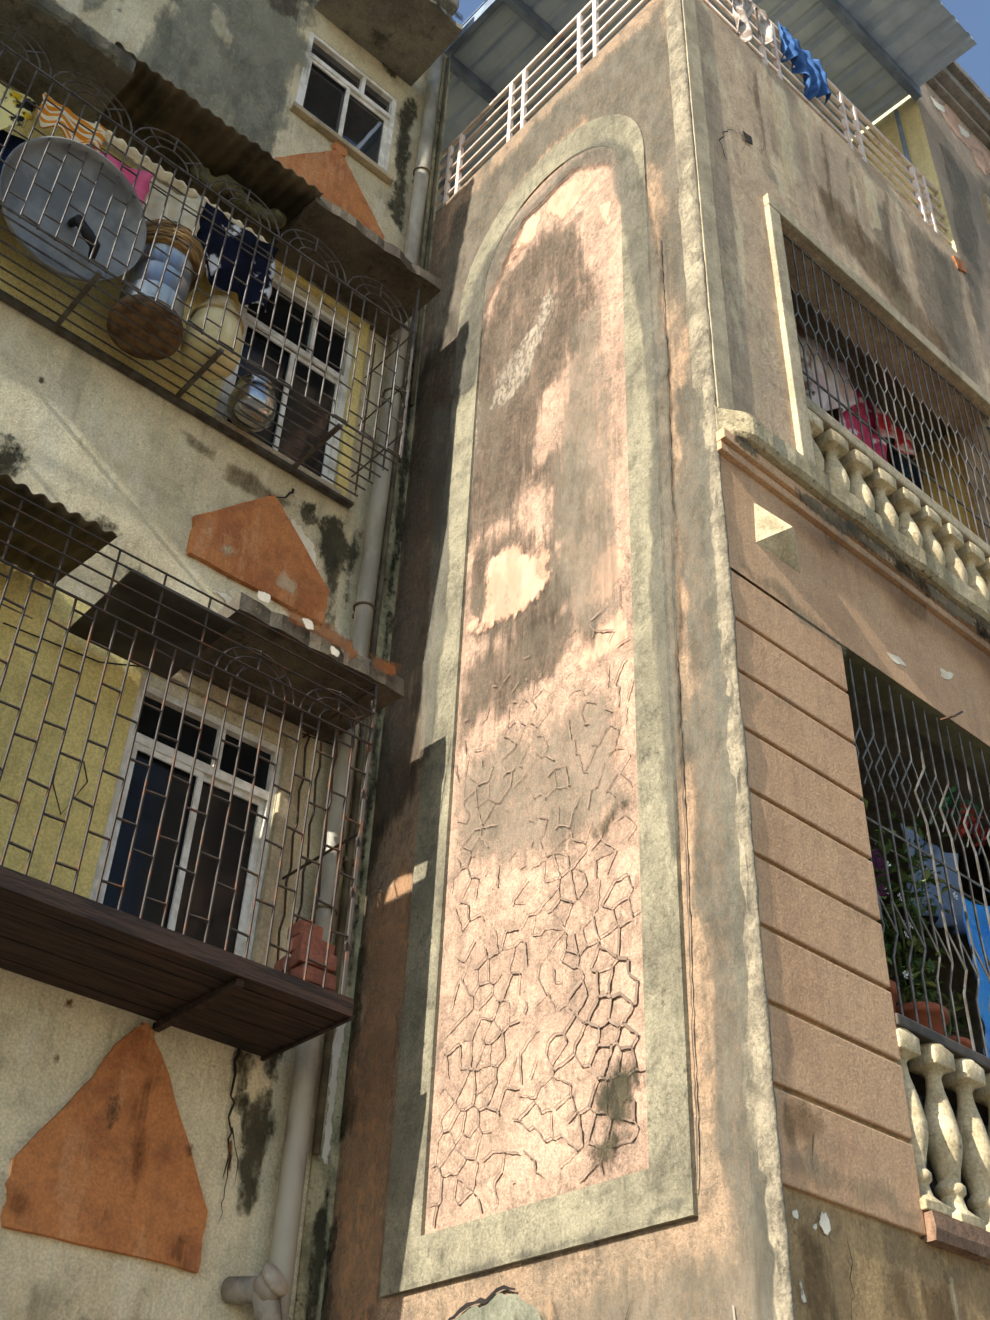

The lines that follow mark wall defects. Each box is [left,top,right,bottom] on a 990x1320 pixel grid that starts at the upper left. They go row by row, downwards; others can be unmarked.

leakage [25,0,316,153]
peeling [930,96,990,175]
crack [660,239,672,504]
leakage [0,435,23,476]
leakage [795,487,990,643]
leakage [301,0,774,1320]
crack [427,582,644,1226]
crack [675,644,698,1192]
crack [218,1048,241,1223]
leakage [234,1050,283,1215]
spalling [448,1285,556,1320]
peeling [813,1212,831,1236]